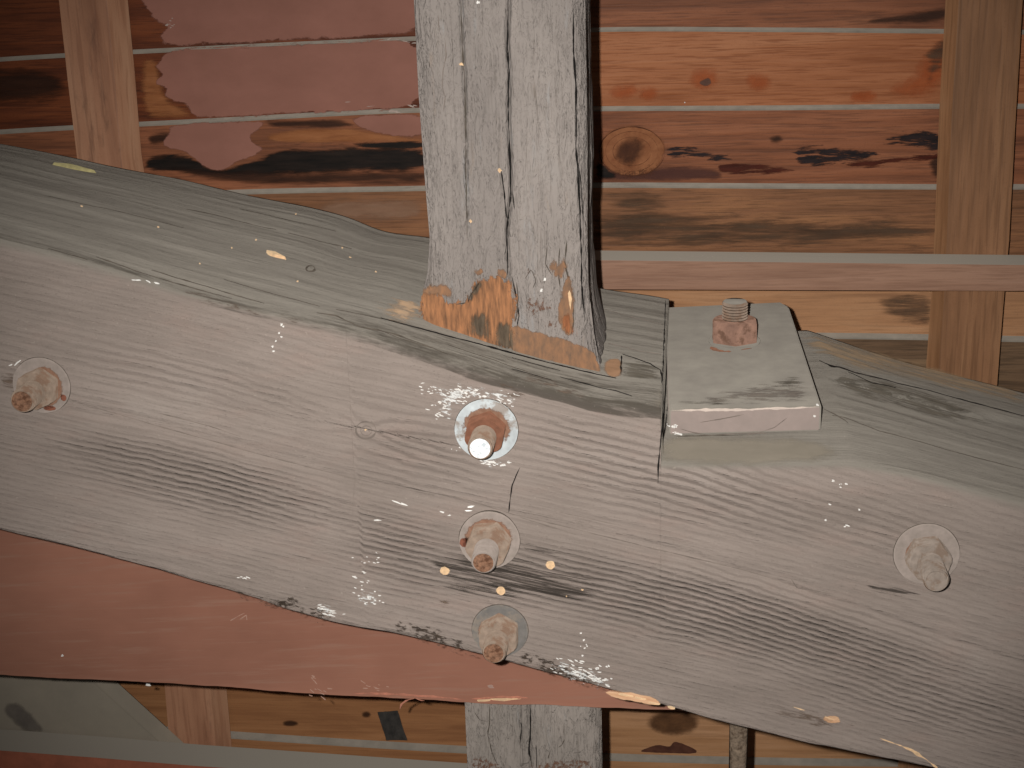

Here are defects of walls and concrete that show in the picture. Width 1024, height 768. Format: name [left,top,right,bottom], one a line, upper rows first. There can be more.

water stain [150,134,168,143]
water stain [147,141,424,183]
water stain [611,147,788,180]
water stain [793,131,938,175]
peeling [420,261,621,377]
corrosion [41,367,66,411]
corrosion [463,408,510,441]
corrosion [460,519,512,547]
crack [419,468,831,594]